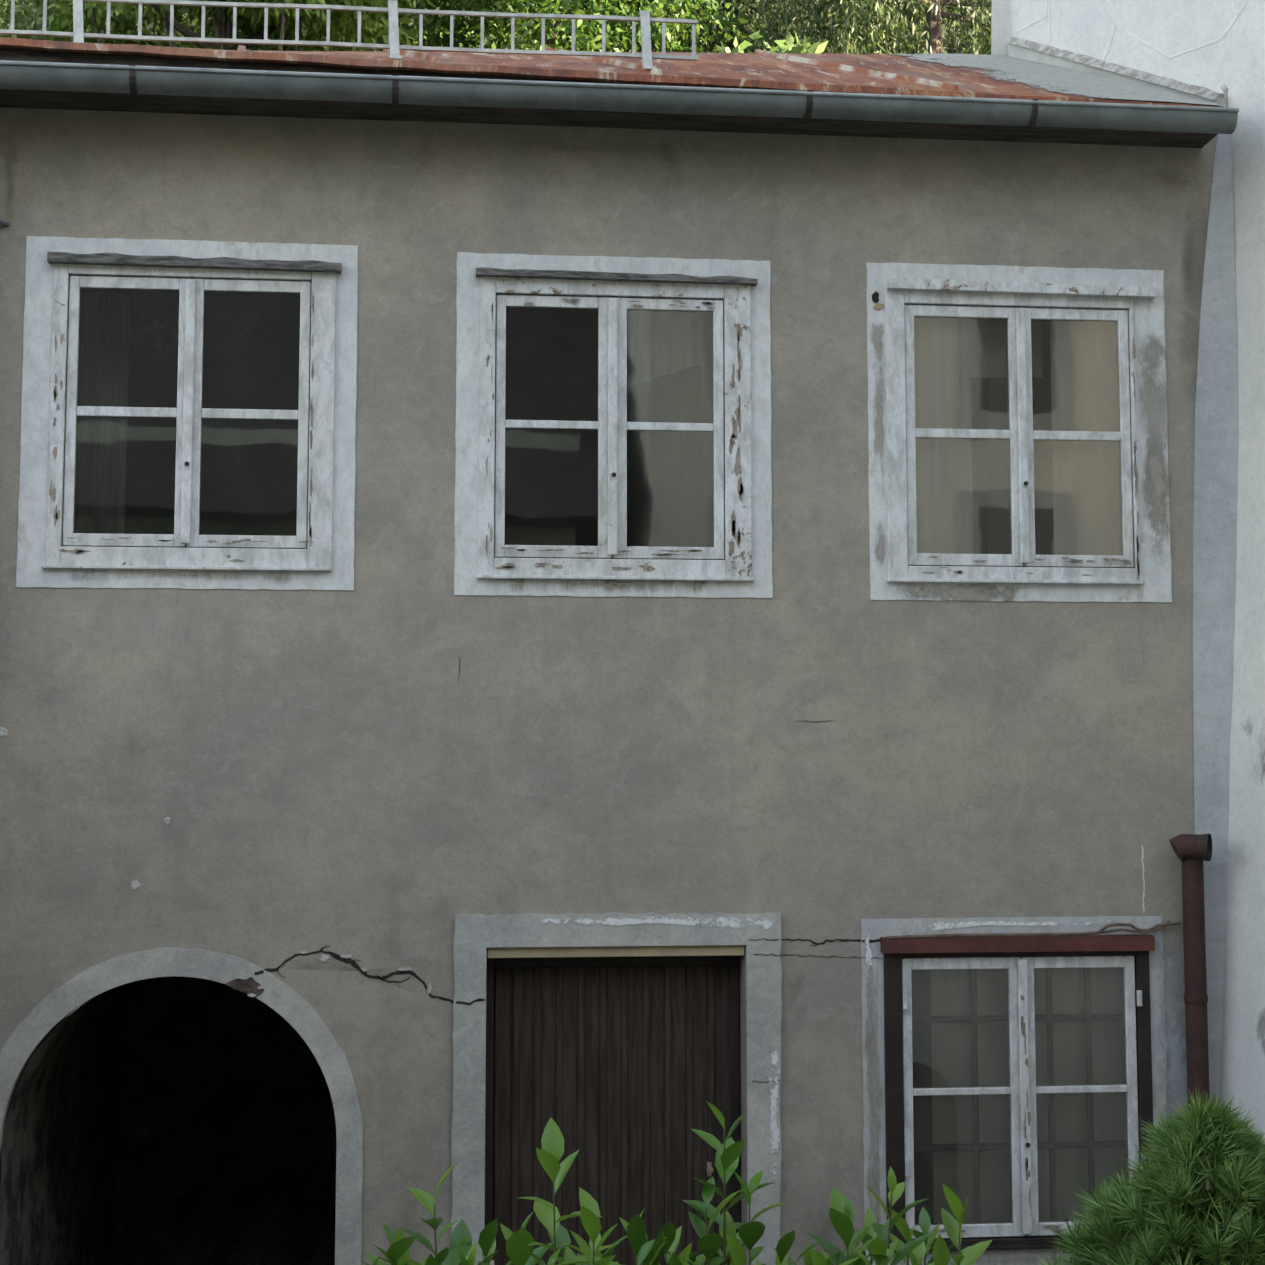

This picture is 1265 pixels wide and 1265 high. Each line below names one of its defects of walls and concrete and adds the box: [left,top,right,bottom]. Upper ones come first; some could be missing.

peeling [728,327,744,557]
spalling [225,976,264,999]
crack [254,946,485,1005]
crack [749,938,881,959]